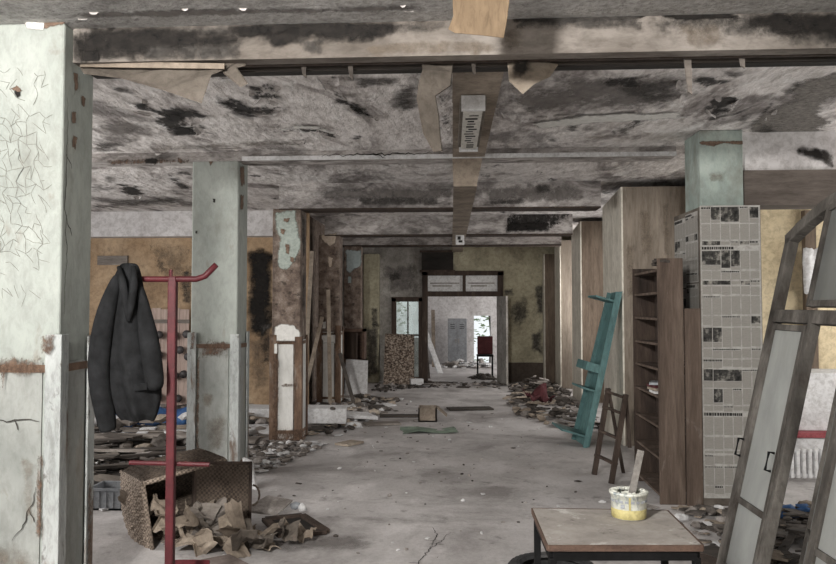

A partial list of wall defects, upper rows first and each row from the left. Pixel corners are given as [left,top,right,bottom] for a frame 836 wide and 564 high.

damp [73,22,421,62]
damp [514,16,645,28]
damp [663,13,836,46]
damp [797,147,833,167]
crack [0,68,72,312]
peeling [275,210,300,270]
damp [248,249,273,379]
rust [0,335,54,388]
rust [190,332,227,448]
crack [0,419,39,430]
crack [12,488,36,540]